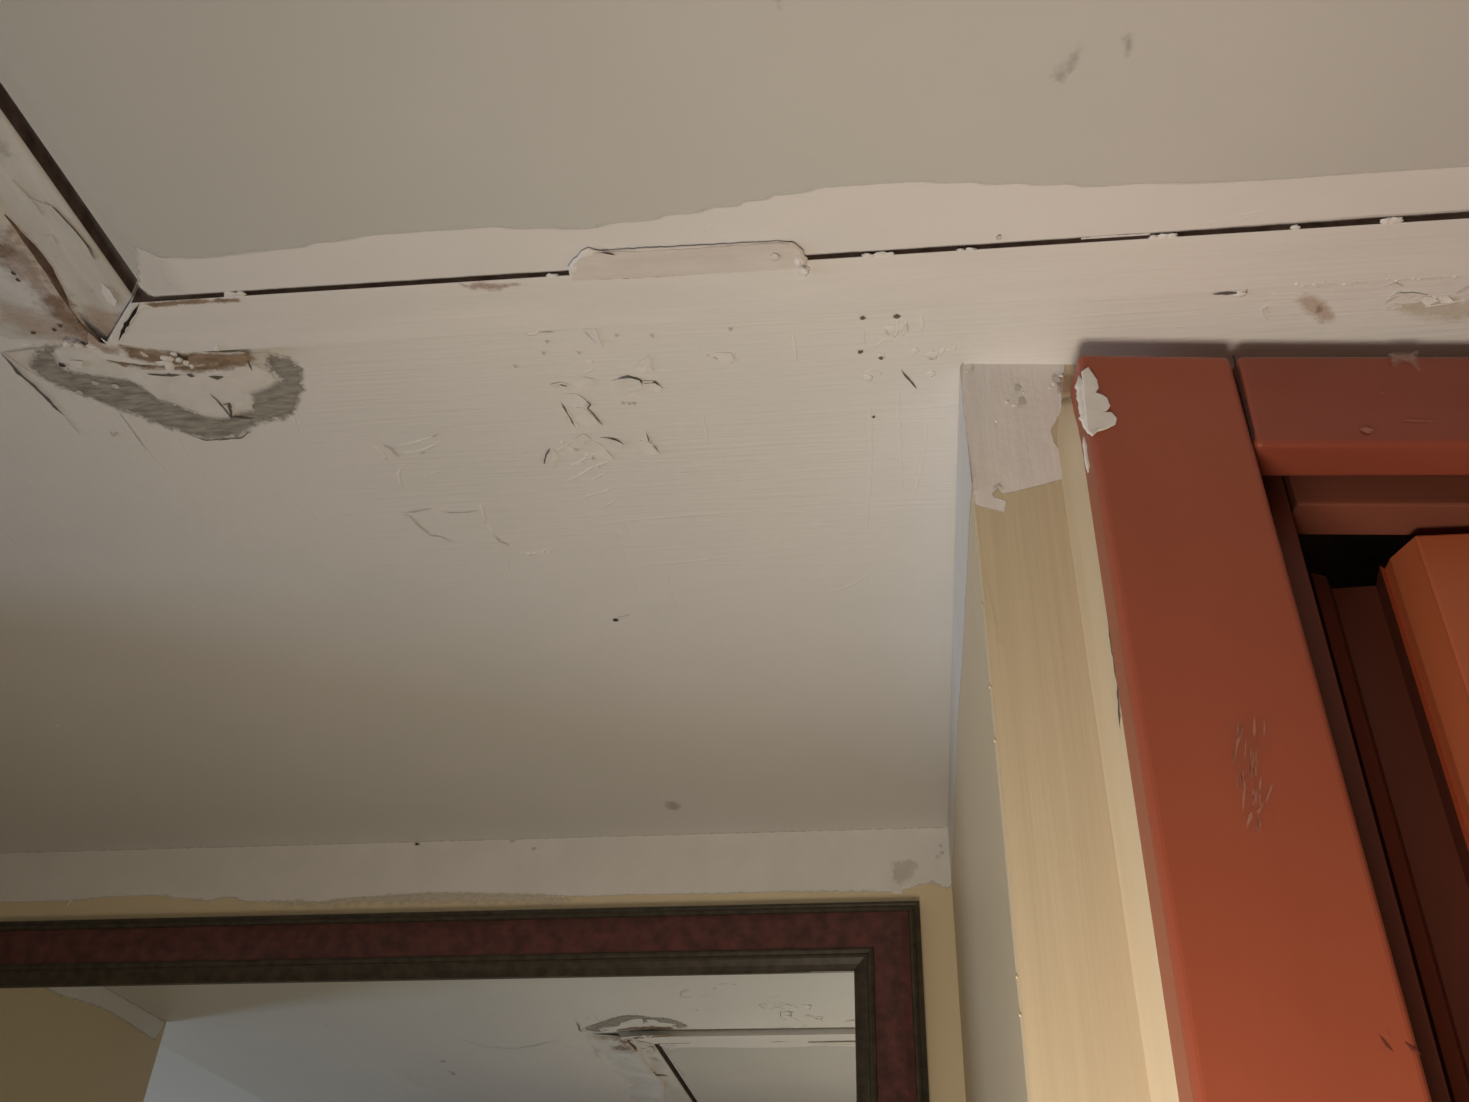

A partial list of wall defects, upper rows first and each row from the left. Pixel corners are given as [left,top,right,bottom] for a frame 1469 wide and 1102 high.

spalling [0,207,304,441]
peeling [1206,289,1248,298]
peeling [1384,274,1469,310]
peeling [544,352,662,506]